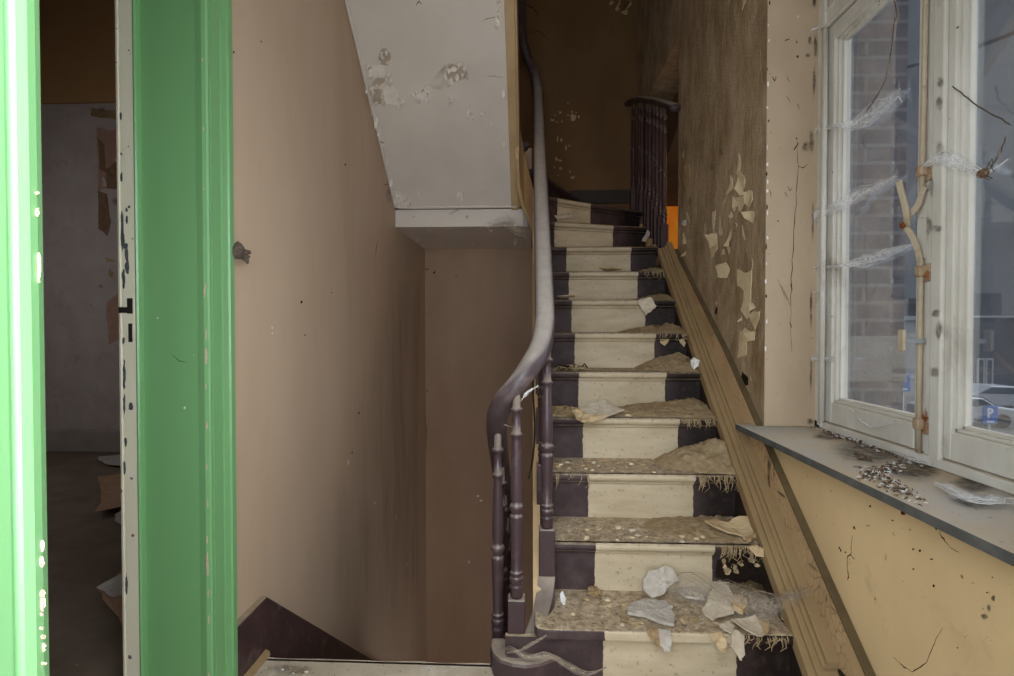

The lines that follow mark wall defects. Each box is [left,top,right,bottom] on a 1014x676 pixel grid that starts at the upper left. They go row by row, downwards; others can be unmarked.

peeling [90,108,133,344]
peeling [703,154,760,358]
peeling [123,359,133,415]
peeling [39,590,47,665]
crack [898,629,942,672]